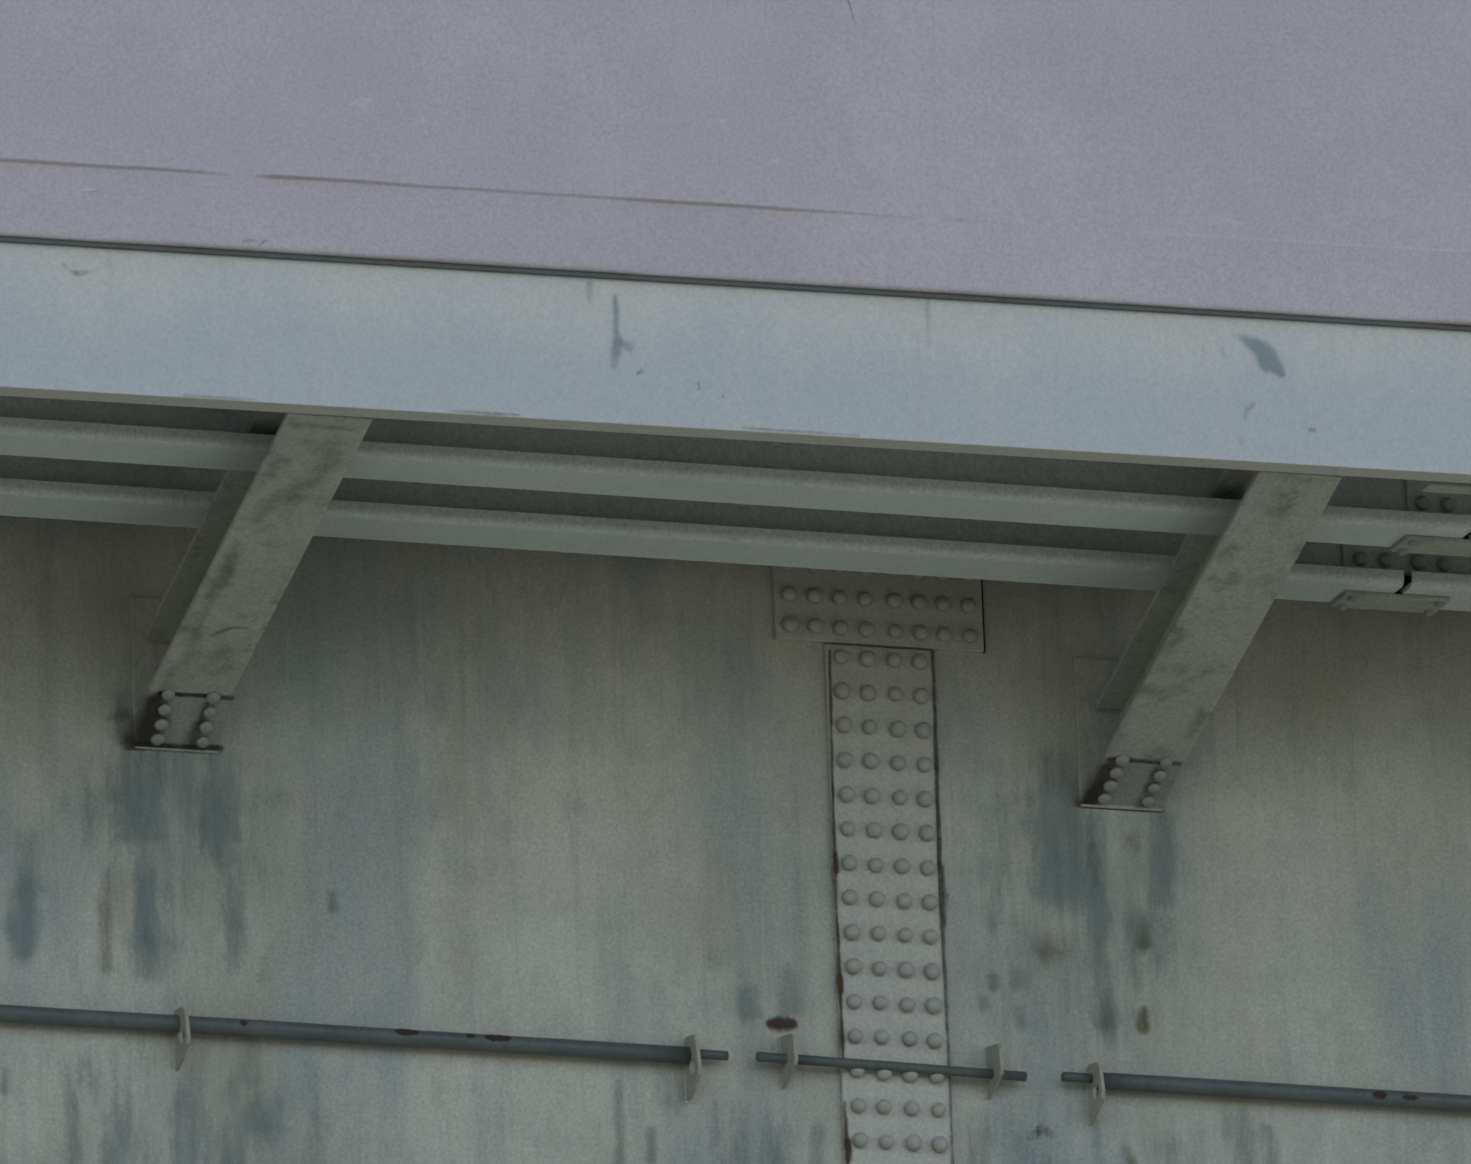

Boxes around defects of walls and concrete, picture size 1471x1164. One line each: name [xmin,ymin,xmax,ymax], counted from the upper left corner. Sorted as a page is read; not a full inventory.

rust [767,1017,797,1030]
leakage [1139,1008,1148,1031]